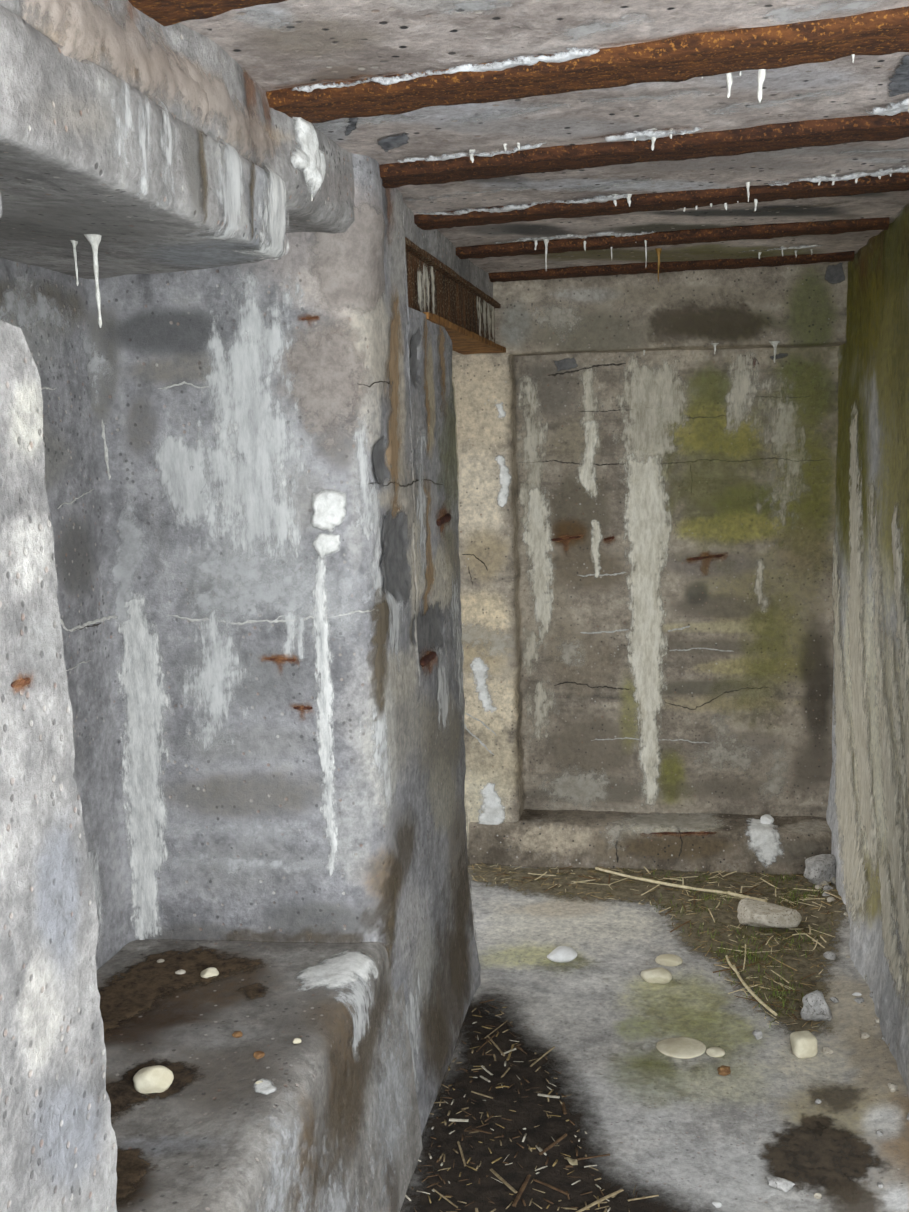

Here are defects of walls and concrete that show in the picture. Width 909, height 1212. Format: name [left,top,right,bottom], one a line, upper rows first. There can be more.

damp [293,22,627,93]
corrosion [385,295,401,518]
corrosion [423,486,451,614]
corrosion [11,677,31,690]
crack [56,594,117,632]
damp [113,276,403,940]
crack [169,604,374,625]
corrosion [262,655,296,670]
crack [554,682,629,690]
damp [579,353,721,839]
crack [668,626,734,652]
damp [759,1086,886,1212]